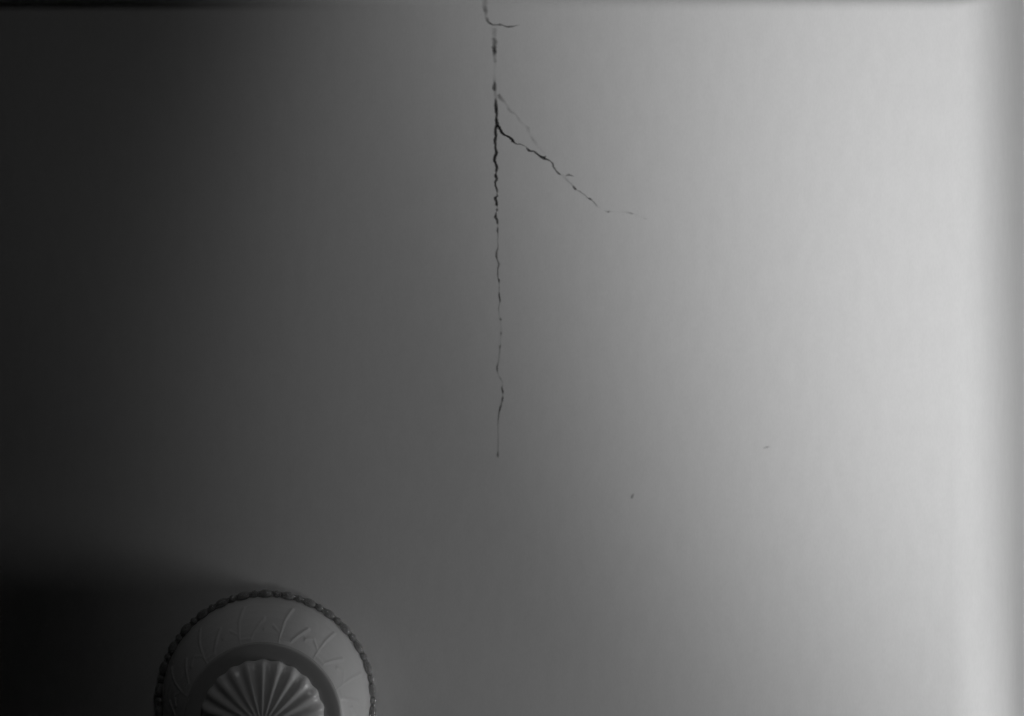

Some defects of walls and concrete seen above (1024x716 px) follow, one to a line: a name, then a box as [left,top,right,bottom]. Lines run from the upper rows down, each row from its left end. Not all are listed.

crack [493,84,553,231]